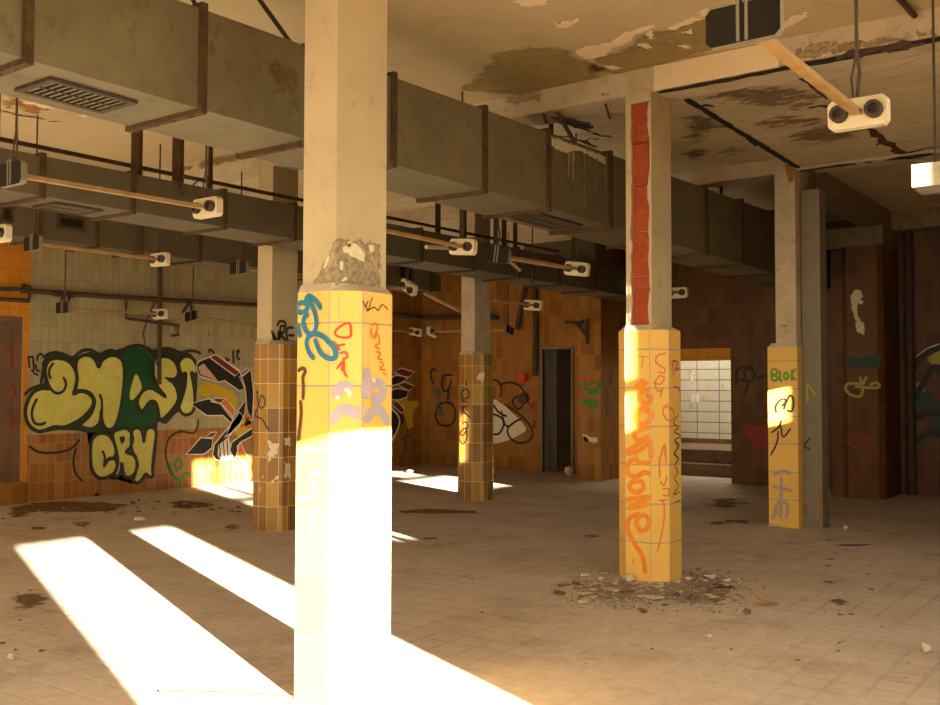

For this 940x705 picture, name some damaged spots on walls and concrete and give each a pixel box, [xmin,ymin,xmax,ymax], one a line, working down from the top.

water stain [462,19,711,95]
peeling [575,8,709,70]
peeling [784,12,808,28]
water stain [682,116,742,157]
water stain [708,86,856,144]
crack [656,37,940,172]
water stain [552,137,607,207]
flaking render [314,238,382,287]